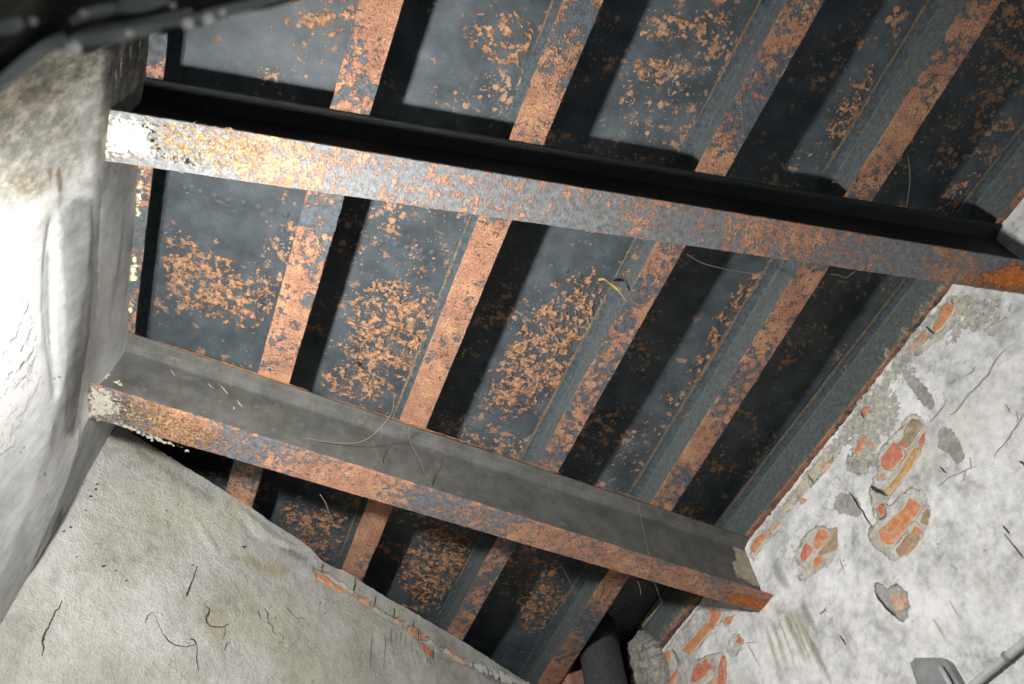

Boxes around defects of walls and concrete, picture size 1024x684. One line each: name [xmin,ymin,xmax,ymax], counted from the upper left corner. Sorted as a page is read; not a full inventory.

corrosion [462,0,554,67]
corrosion [640,0,736,42]
corrosion [140,120,265,171]
corrosion [163,240,276,329]
corrosion [960,261,1024,293]
corrosion [322,214,488,450]
corrosion [485,238,637,473]
spalling [750,295,1014,582]
corrosion [277,497,363,556]
corrosion [394,527,483,603]
spalling [874,582,913,623]
spalling [626,605,744,684]